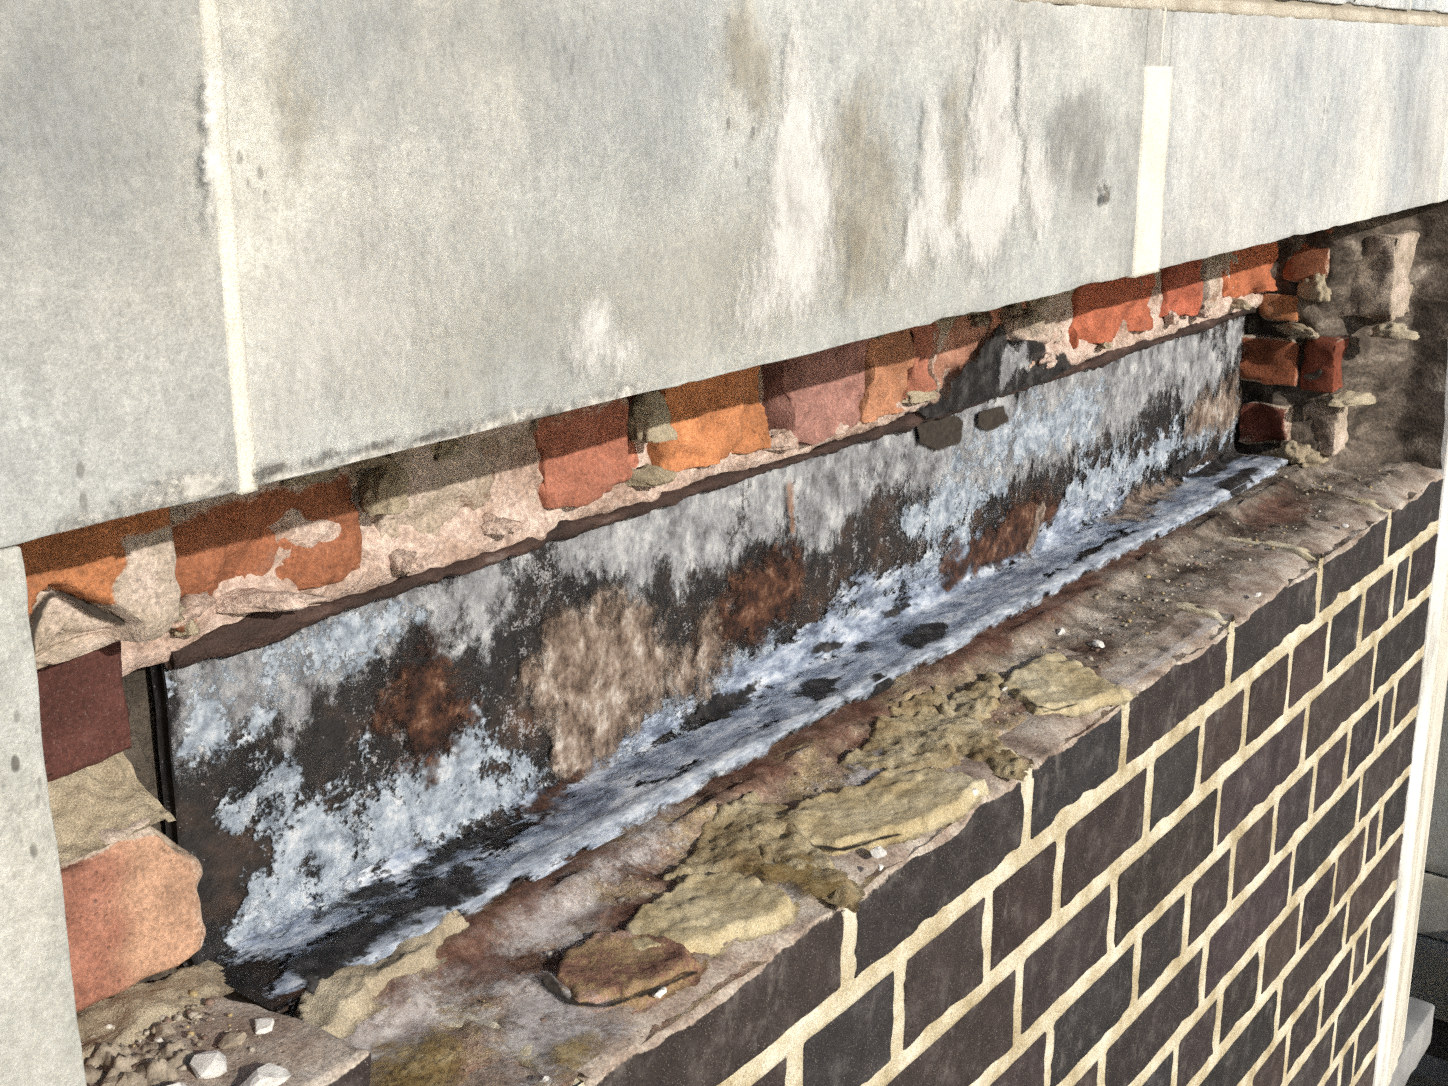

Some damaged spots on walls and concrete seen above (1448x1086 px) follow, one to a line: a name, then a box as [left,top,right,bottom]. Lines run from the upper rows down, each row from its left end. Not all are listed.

water stain [747,28,840,329]
water stain [904,31,1060,268]
water stain [573,303,629,367]
spalling [258,378,652,484]
peeling [1168,449,1262,496]
corrosion [516,483,806,825]
peeling [682,681,761,726]
water stain [164,317,1288,1086]
corrosion [702,691,893,793]
peeling [882,596,949,649]
corrosion [934,478,1188,663]
corrosion [436,846,608,986]